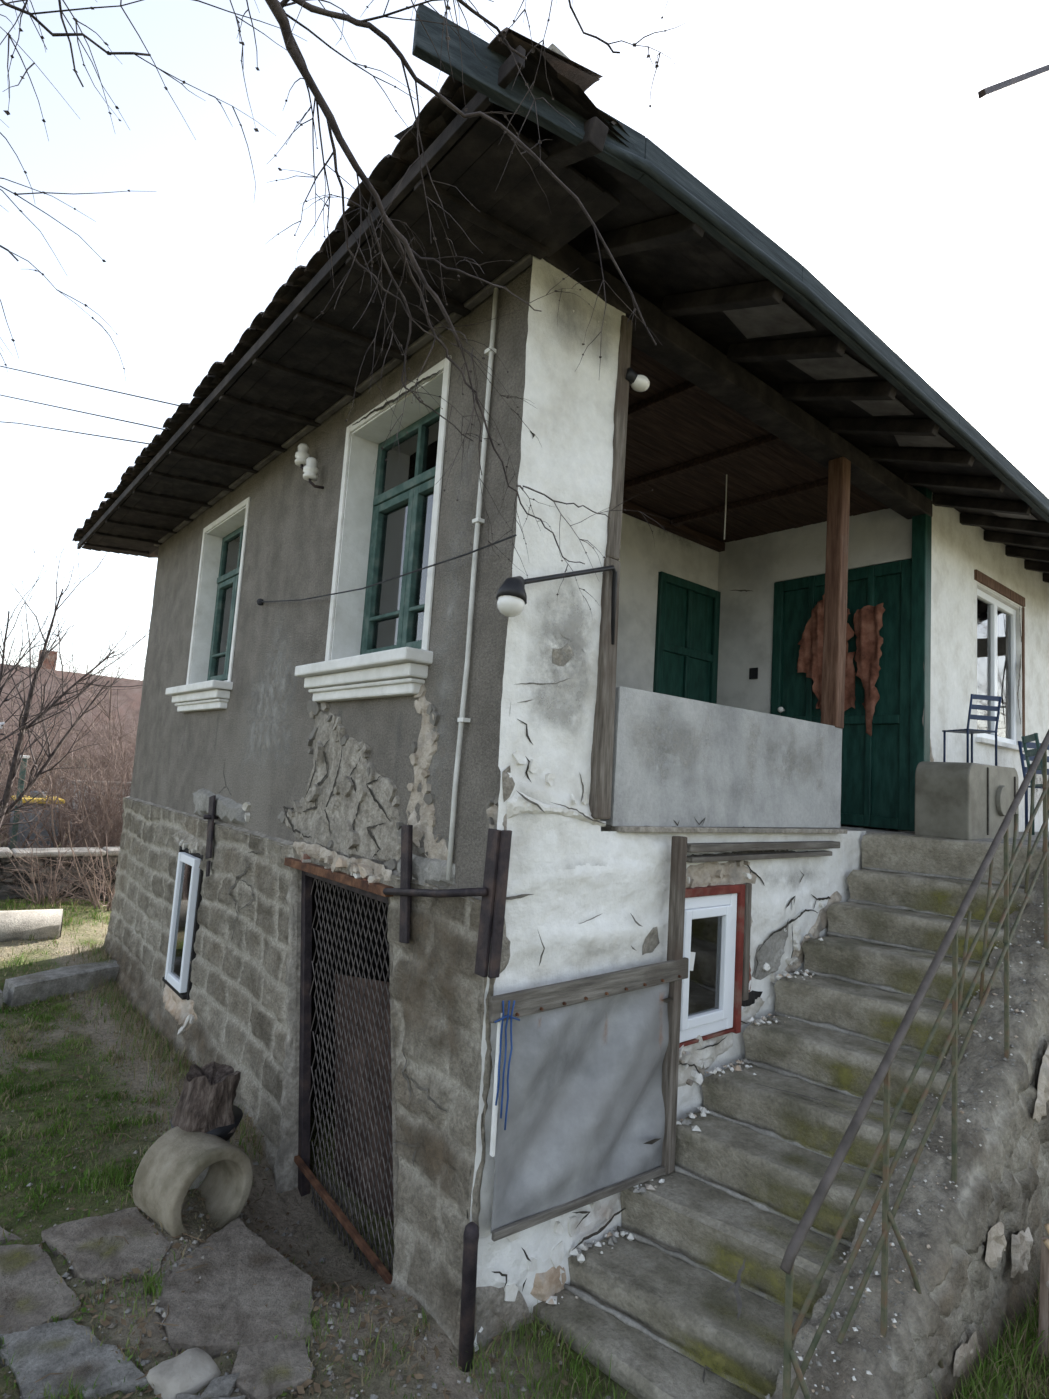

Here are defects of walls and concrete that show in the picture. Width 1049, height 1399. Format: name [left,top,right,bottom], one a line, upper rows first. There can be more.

flaking render [278,684,455,883]
crack [514,635,586,783]
flaking render [678,891,842,1087]
flaking render [476,1192,626,1348]